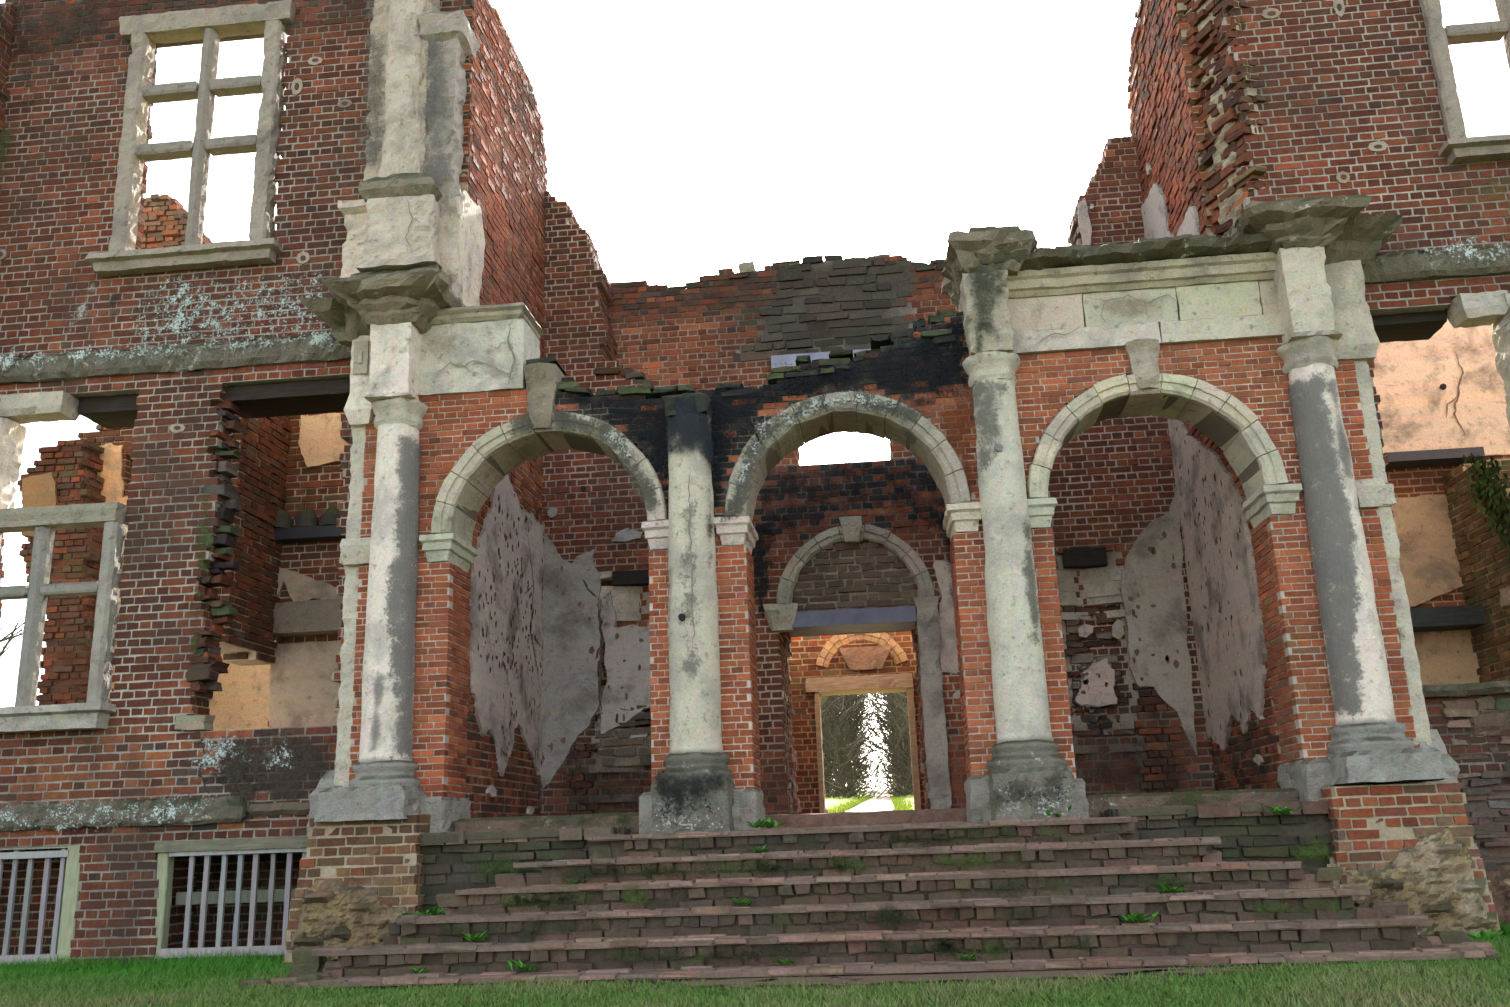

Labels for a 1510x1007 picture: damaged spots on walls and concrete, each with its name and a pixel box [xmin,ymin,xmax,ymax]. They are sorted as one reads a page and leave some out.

water stain [511,412,534,436]
peeling [469,474,651,815]
water stain [552,319,984,674]
peeling [1063,419,1268,756]